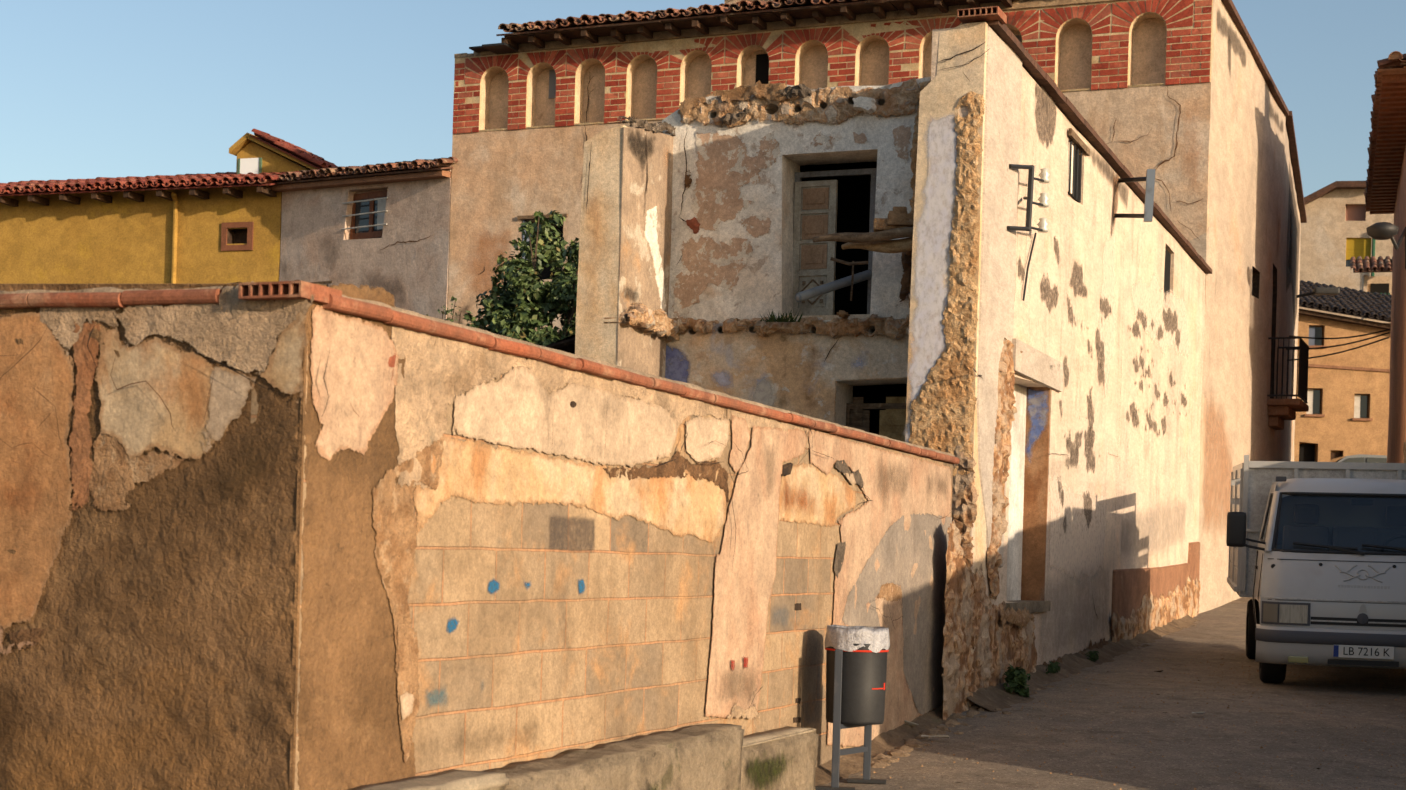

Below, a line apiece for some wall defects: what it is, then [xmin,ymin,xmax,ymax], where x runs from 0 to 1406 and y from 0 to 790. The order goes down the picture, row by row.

flaking render [0,305,399,655]
flaking render [372,366,751,762]
peeling [644,80,812,319]
flaking render [778,460,864,527]
spalling [834,542,846,578]
peeling [893,125,911,164]
flaking render [899,250,912,302]
flaking render [986,338,1023,599]
peeling [1019,171,1189,578]
crack [1107,87,1202,239]